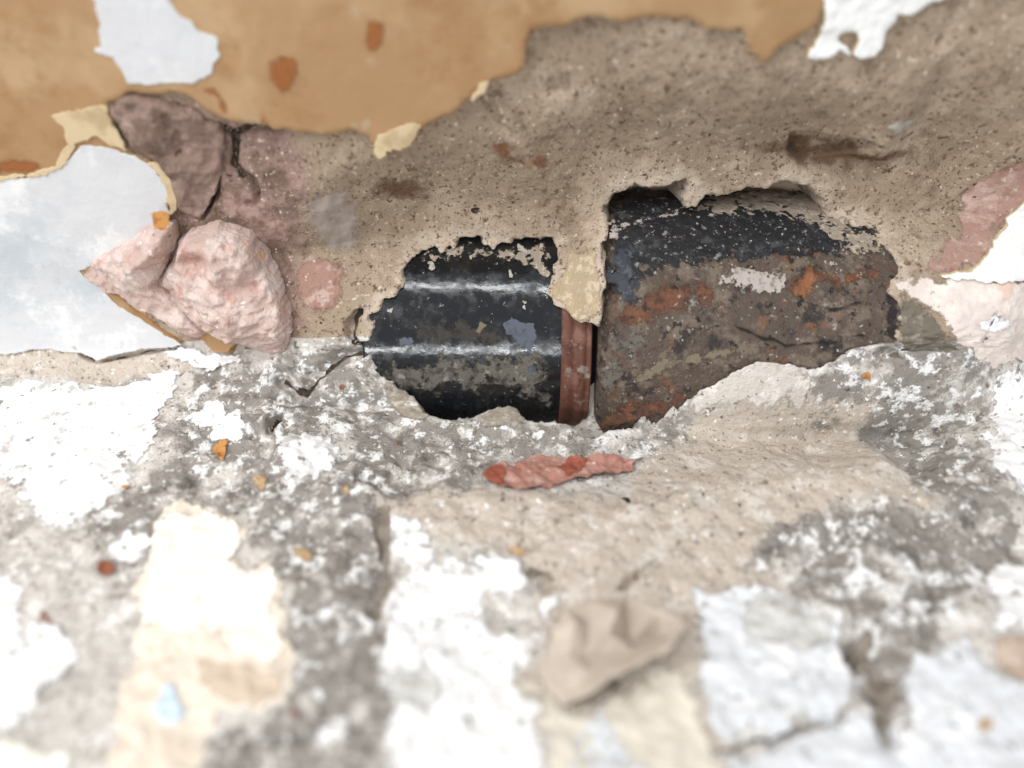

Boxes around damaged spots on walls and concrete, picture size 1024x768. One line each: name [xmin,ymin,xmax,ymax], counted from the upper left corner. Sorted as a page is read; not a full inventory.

crack [221,123,261,199]
spalling [0,0,1024,528]
rust [612,281,715,326]
rust [786,263,897,299]
rust [589,389,698,433]